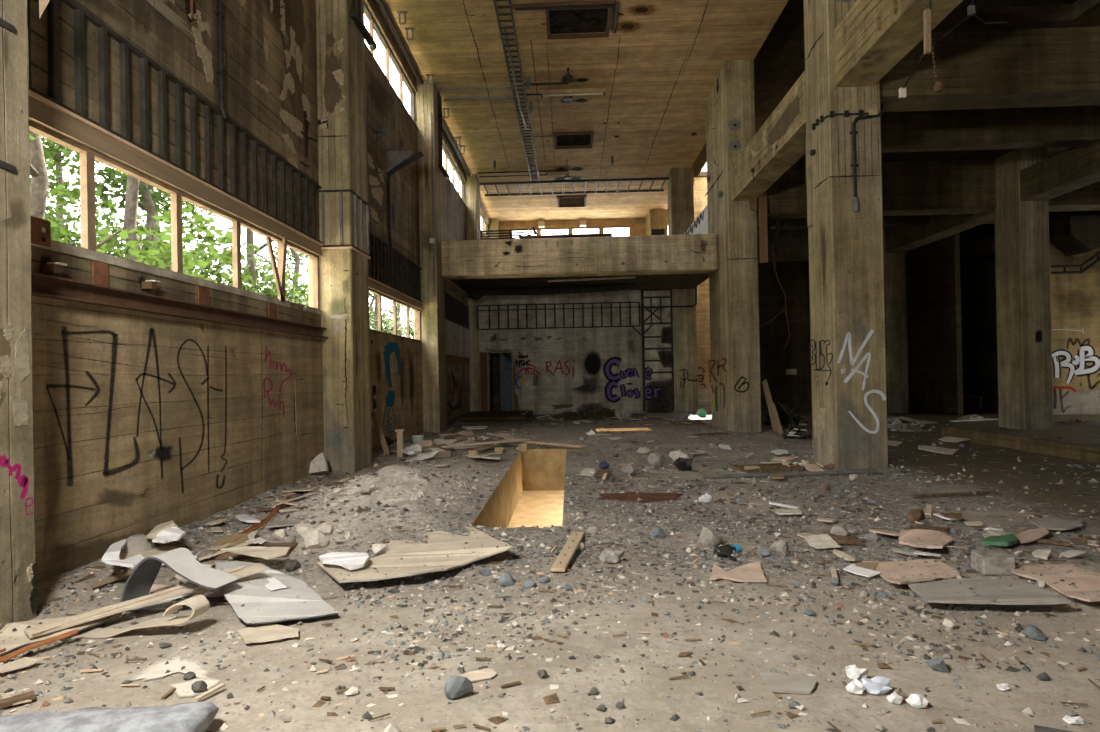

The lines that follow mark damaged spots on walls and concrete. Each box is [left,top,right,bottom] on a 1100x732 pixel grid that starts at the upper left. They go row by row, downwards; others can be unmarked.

peeling [184,0,225,84]
peeling [254,0,345,179]